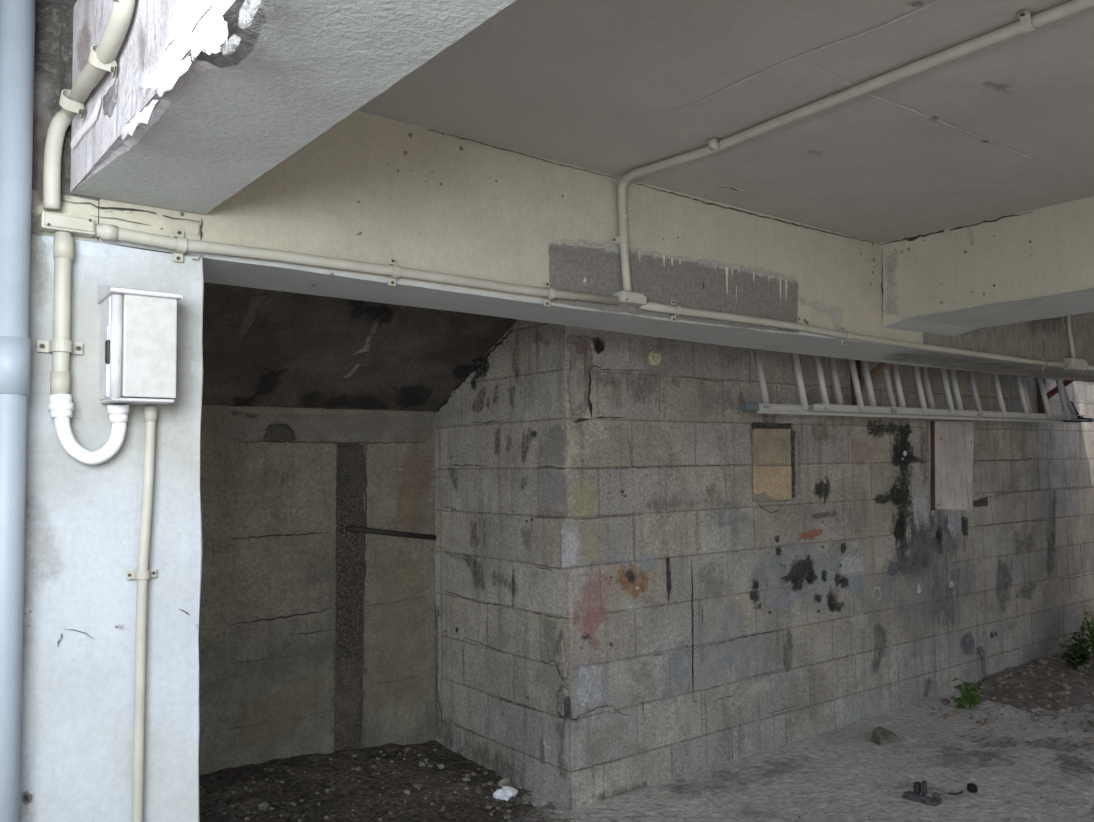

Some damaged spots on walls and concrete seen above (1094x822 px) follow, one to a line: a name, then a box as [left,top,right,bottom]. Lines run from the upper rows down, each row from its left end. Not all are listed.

flaking render [119,0,261,140]
flaking render [70,78,119,149]
water stain [349,300,394,322]
water stain [452,356,489,390]
water stain [302,386,431,409]
crack [239,438,424,446]
crack [230,532,329,540]
water stain [867,421,959,624]
crack [231,608,333,664]